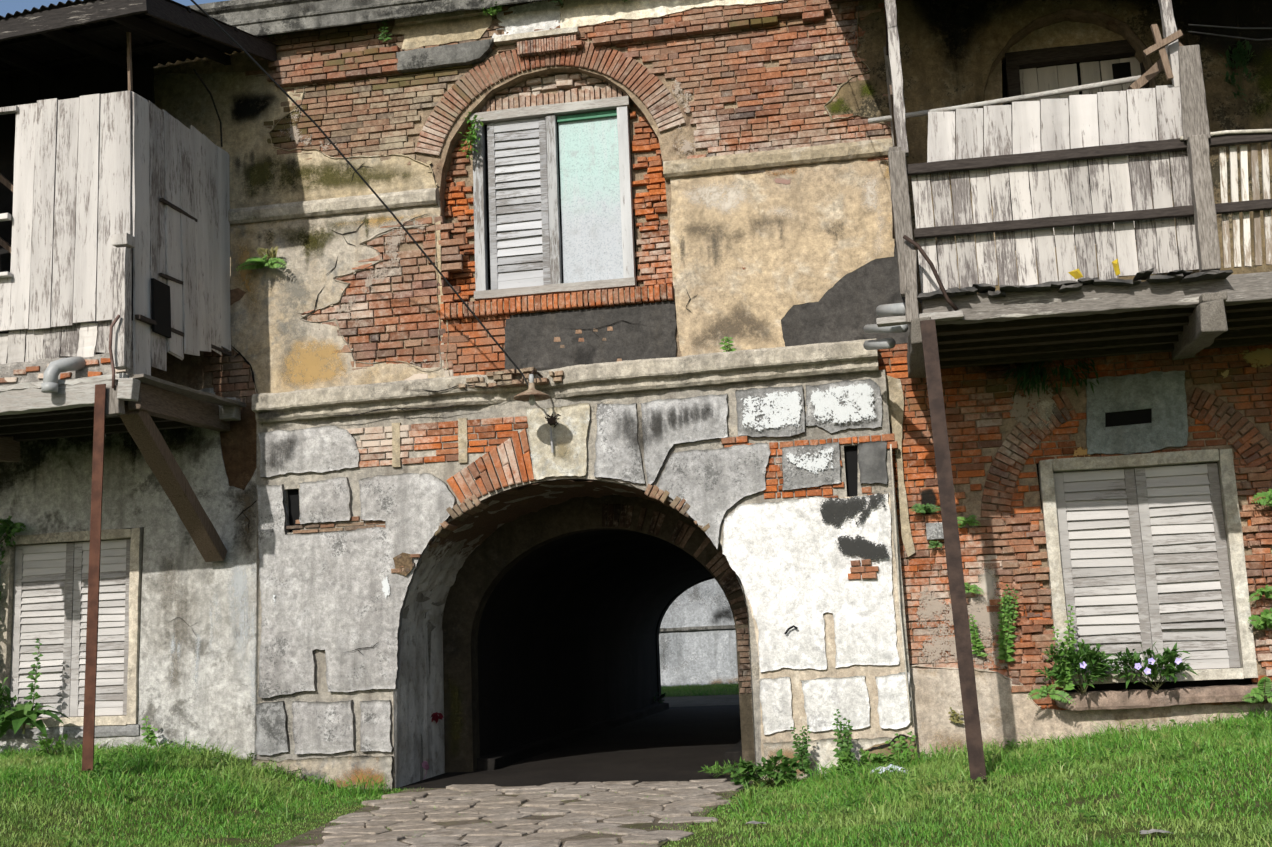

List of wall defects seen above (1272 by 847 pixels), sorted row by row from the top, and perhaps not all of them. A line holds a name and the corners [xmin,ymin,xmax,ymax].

spalling [245,0,561,188]
spalling [576,0,897,159]
spalling [740,166,793,186]
spalling [300,216,564,389]
spalling [204,346,258,491]
spalling [346,416,535,597]
spalling [721,241,1272,710]